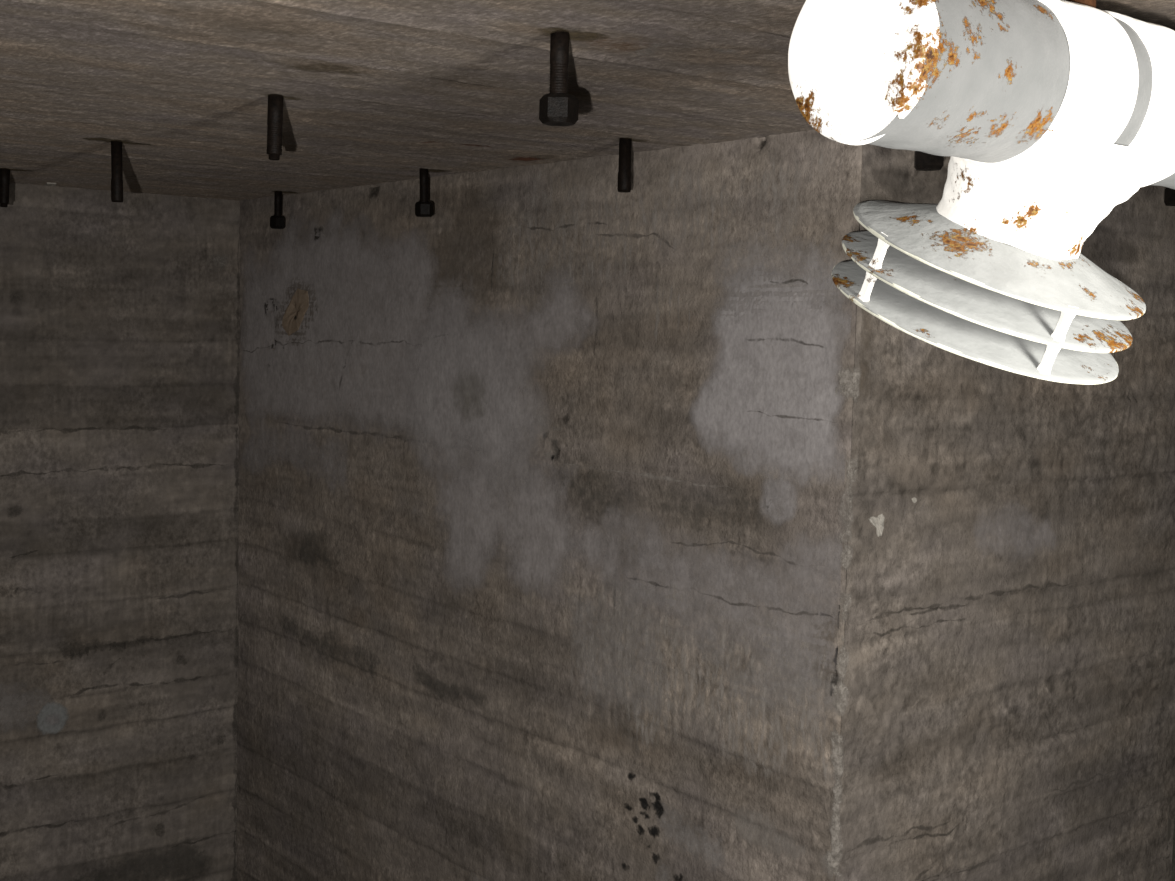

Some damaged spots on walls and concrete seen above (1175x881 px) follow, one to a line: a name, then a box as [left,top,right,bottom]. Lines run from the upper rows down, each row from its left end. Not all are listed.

damp [243,163,845,775]
crack [909,826,954,839]